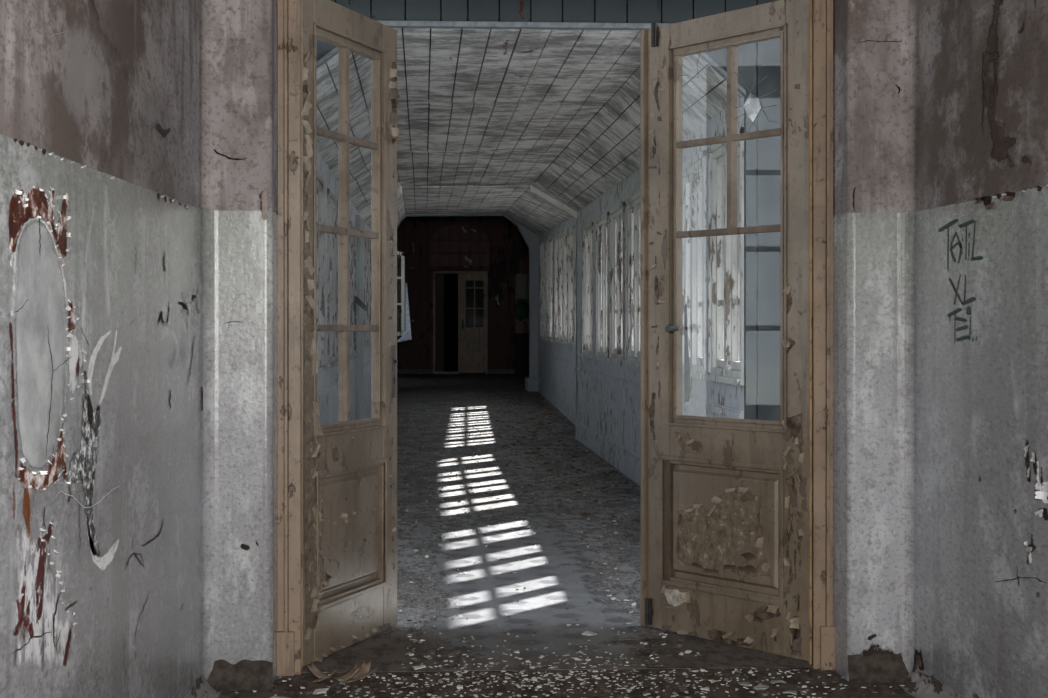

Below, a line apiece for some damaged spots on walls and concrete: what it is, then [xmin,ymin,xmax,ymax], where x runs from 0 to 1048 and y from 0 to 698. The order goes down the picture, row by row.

peeling [9,185,71,266]
spalling [975,184,1048,210]
peeling [65,299,90,400]
peeling [9,322,71,490]
peeling [1024,440,1048,520]
peeling [1024,534,1036,565]
peeling [13,521,78,667]
spalling [914,649,928,678]